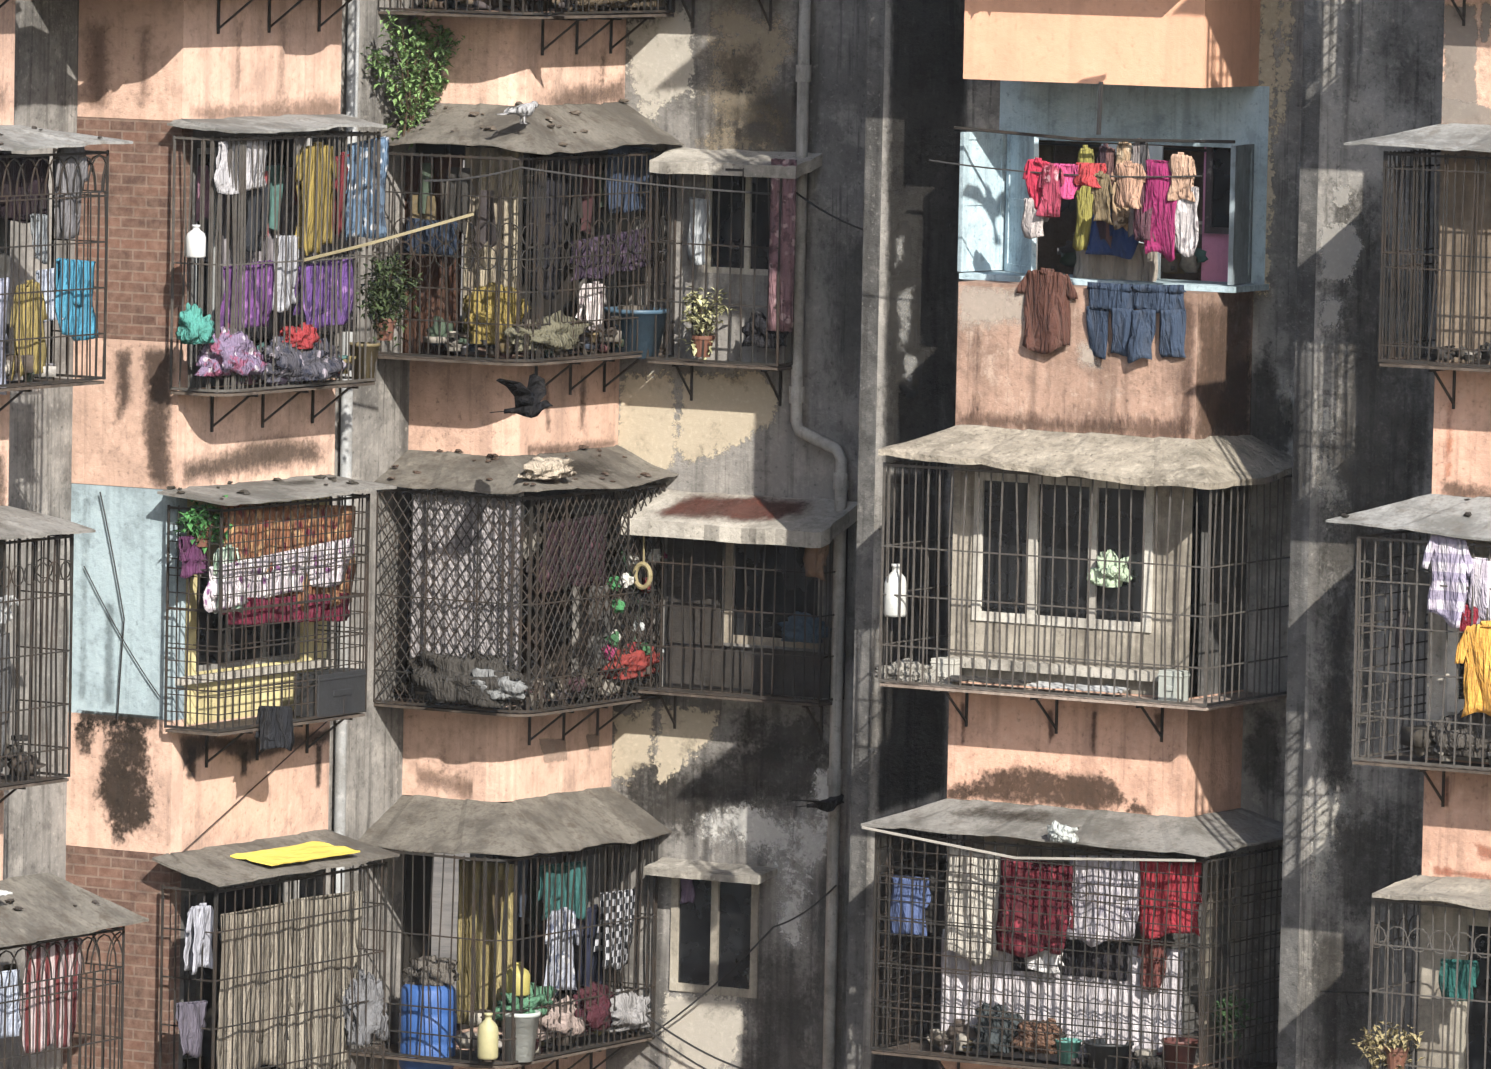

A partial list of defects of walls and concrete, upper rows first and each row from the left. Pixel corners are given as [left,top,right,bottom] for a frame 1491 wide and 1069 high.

flaking render [625,6,696,120]
peeling [1442,2,1491,125]
rust [661,496,808,521]
water stain [872,0,1294,1069]
mould [75,710,158,843]